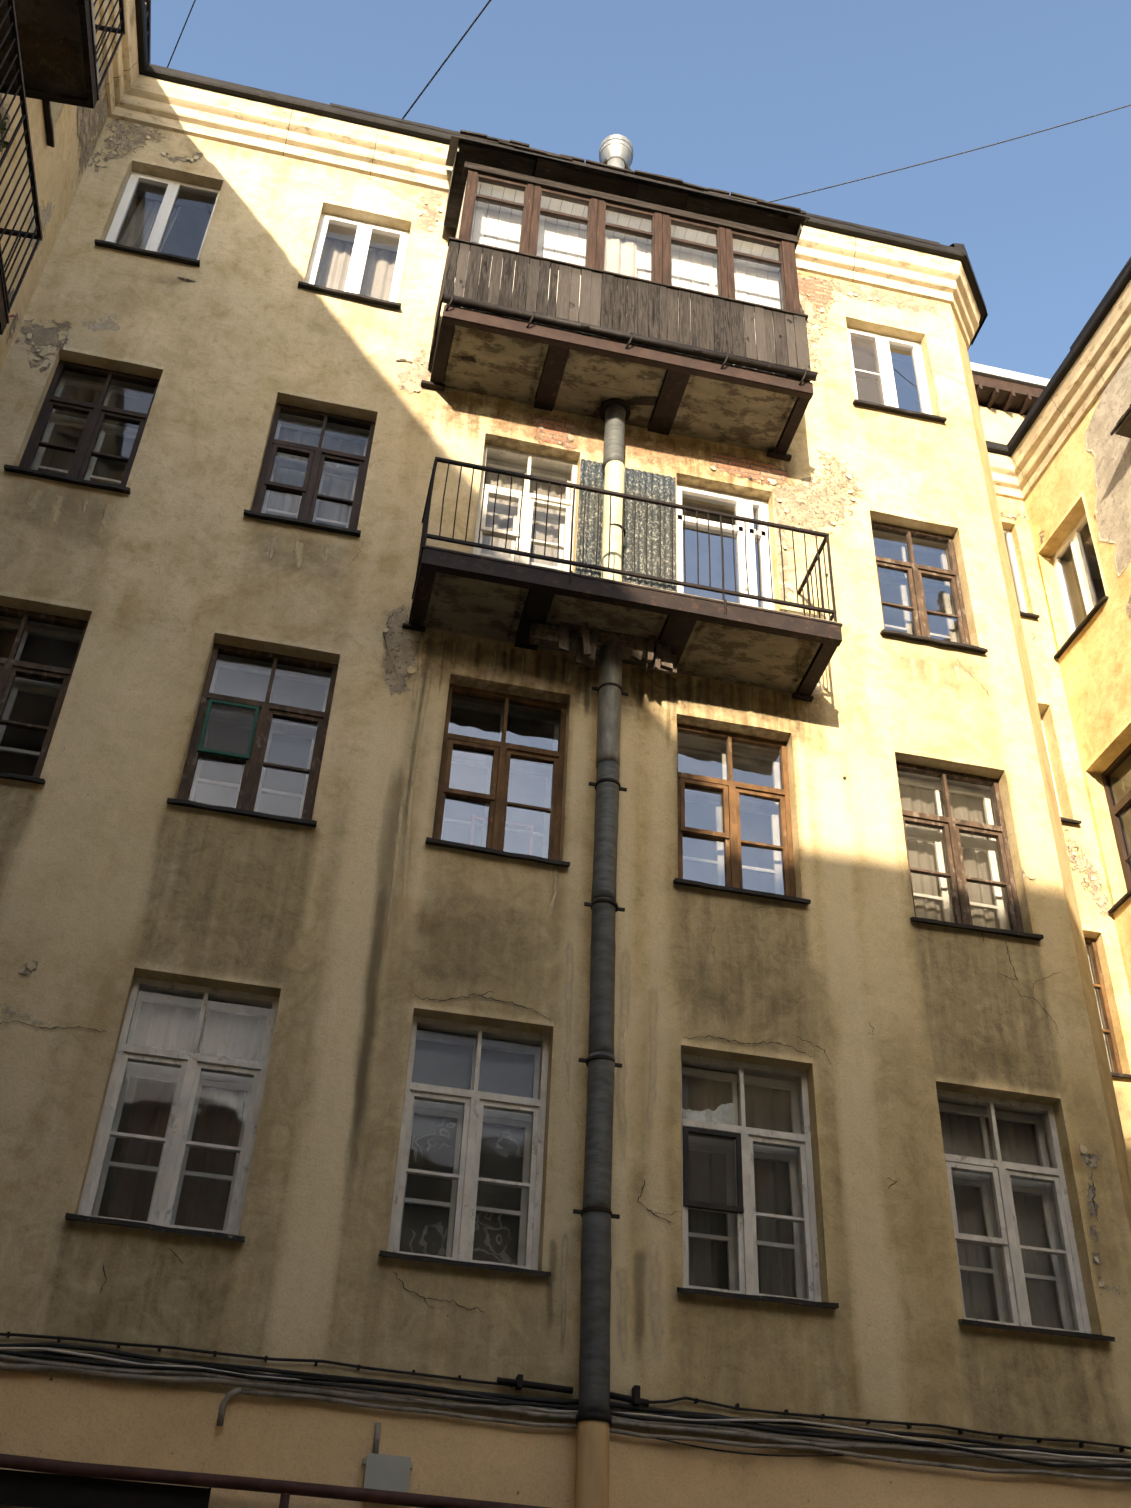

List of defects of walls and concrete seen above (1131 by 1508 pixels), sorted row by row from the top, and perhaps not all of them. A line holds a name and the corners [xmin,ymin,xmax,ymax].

peeling [75,52,209,183]
peeling [7,288,120,373]
flaking render [794,272,938,386]
peeling [709,449,864,612]
flaking render [379,605,433,697]
peeling [1064,829,1111,915]
crack [0,1021,107,1032]
crack [982,934,1060,1033]
flaking render [1080,1143,1105,1287]
crack [394,1272,483,1312]